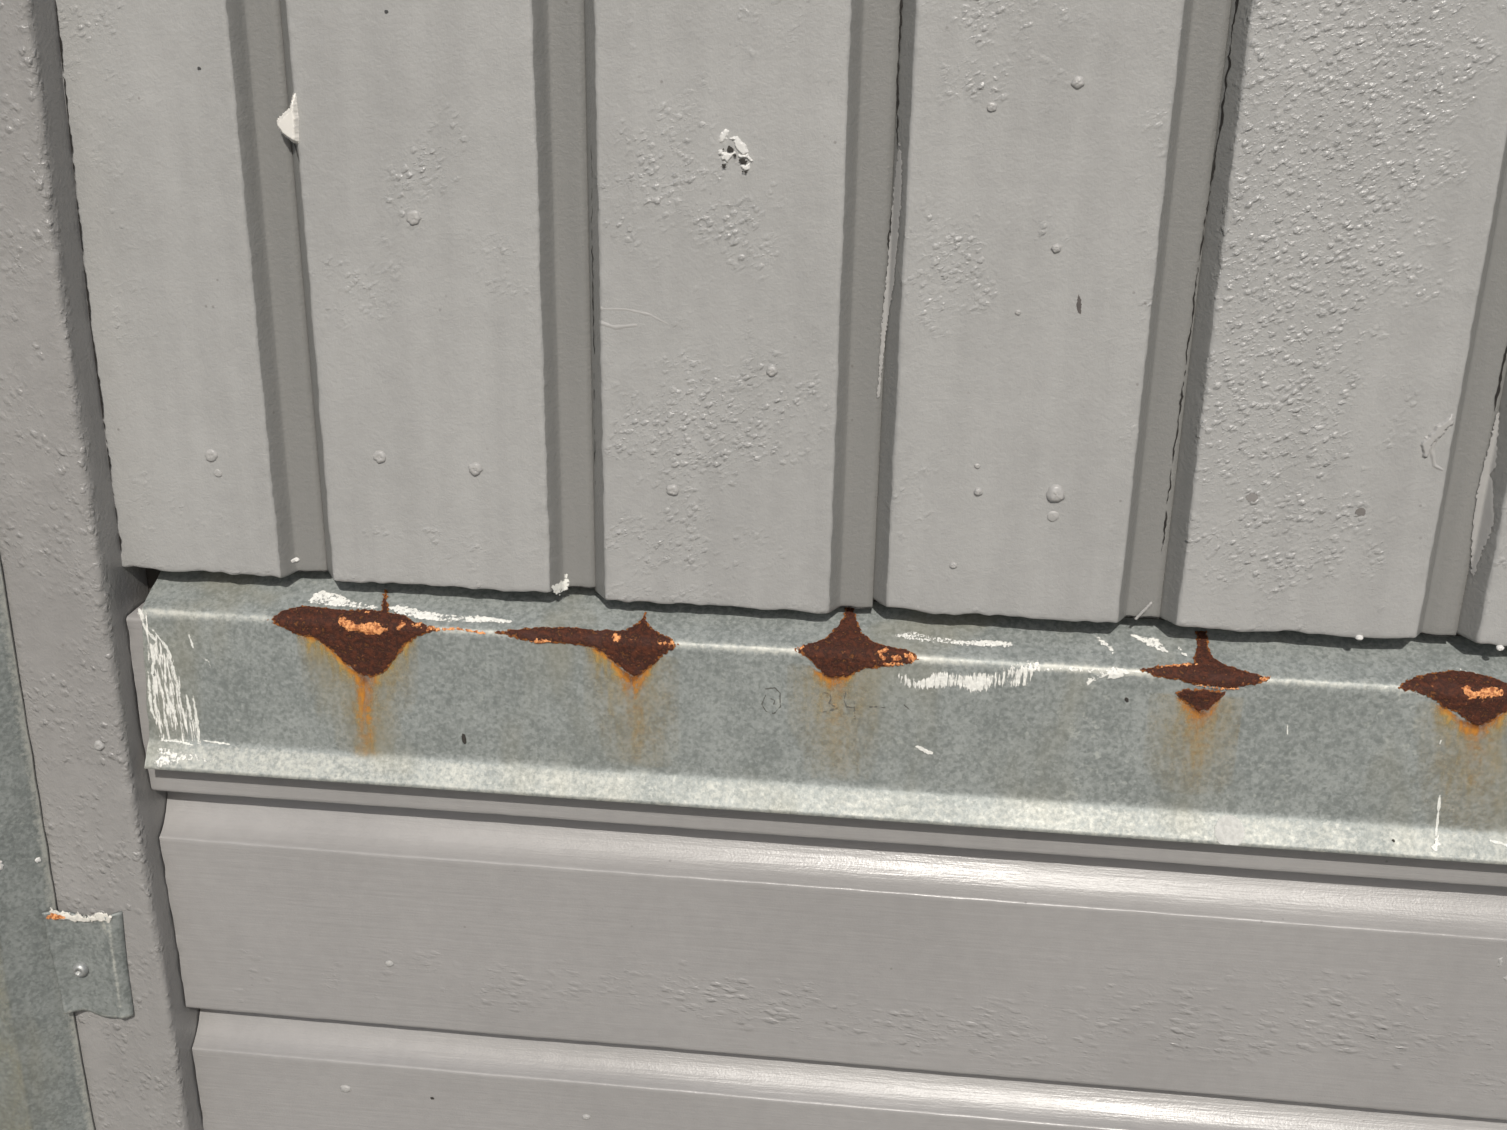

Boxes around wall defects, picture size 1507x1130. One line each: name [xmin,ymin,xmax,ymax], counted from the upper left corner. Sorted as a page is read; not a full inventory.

peeling [718,129,753,174]
rust [271,589,679,745]
rust [795,607,919,689]
rust [1140,631,1270,740]
rust [1398,670,1507,749]